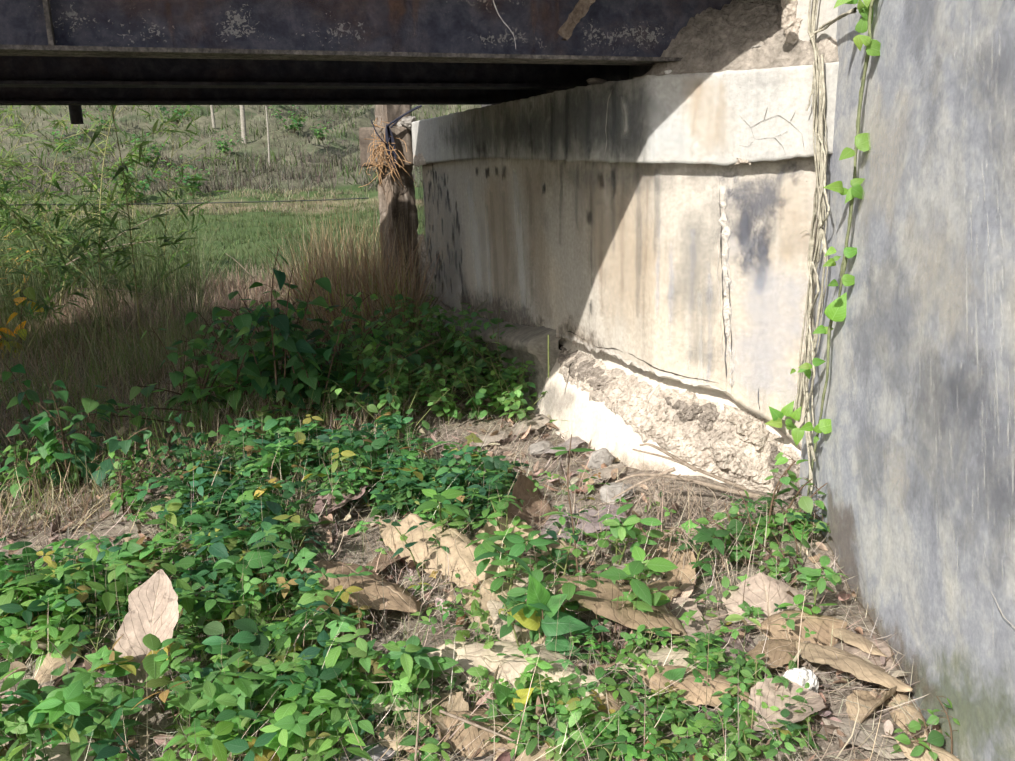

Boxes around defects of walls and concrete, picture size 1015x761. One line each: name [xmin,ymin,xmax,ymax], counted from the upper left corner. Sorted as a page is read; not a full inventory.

spalling [781,0,803,45]
leakage [451,88,642,157]
crack [716,181,735,390]
leakage [727,175,783,288]
spalling [556,331,801,501]